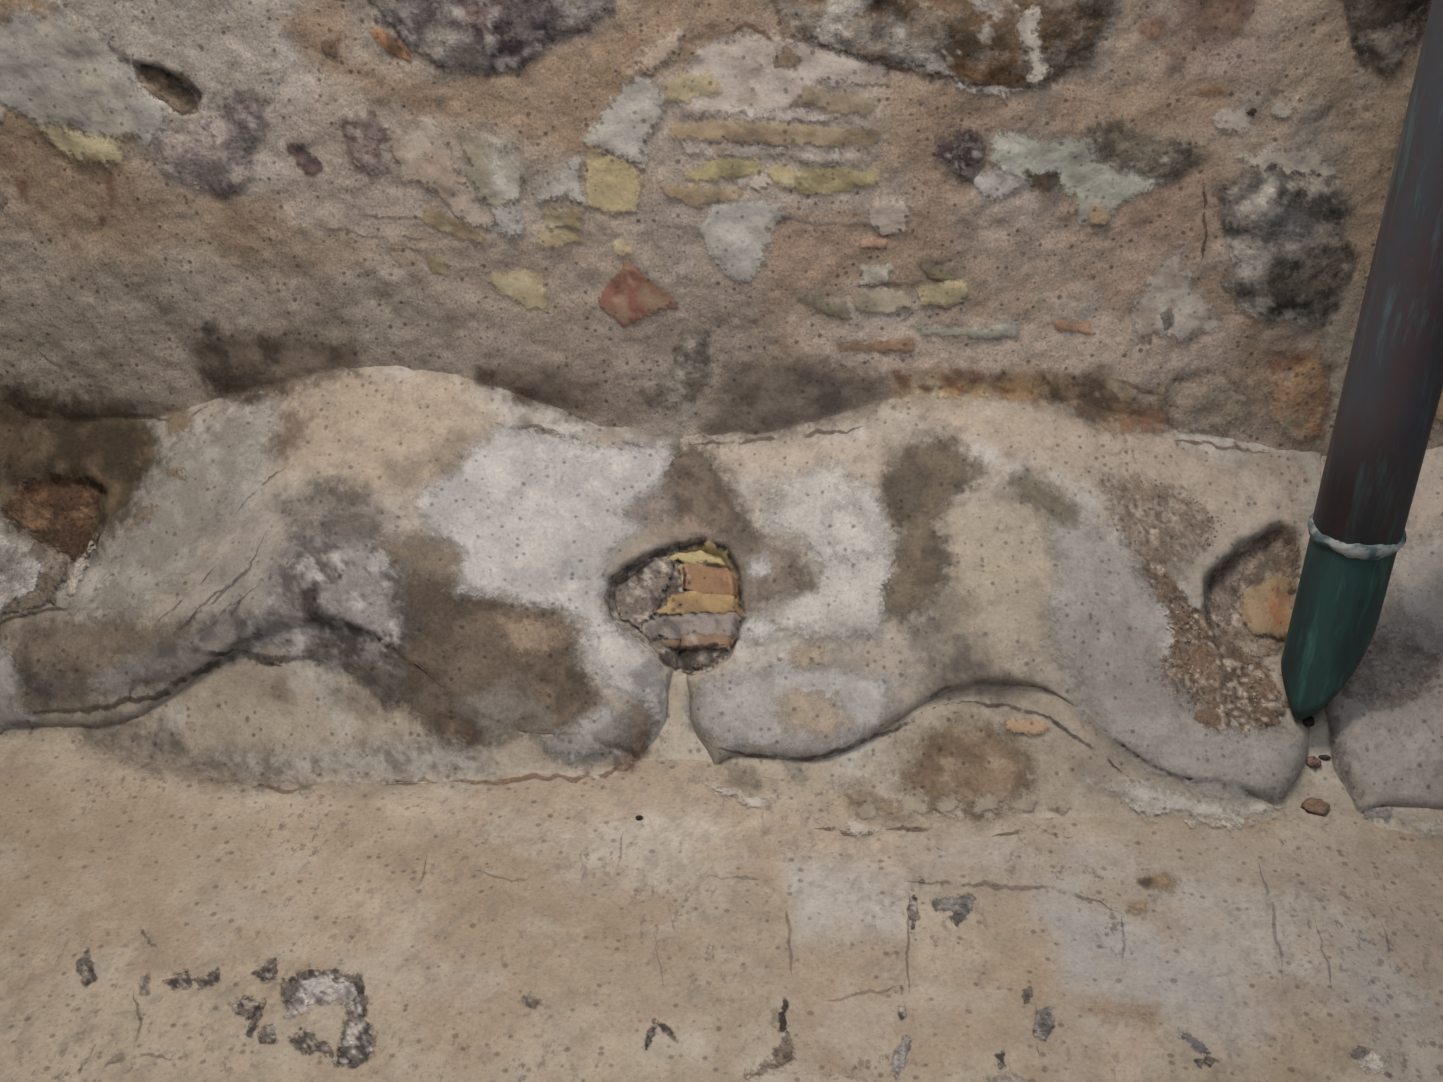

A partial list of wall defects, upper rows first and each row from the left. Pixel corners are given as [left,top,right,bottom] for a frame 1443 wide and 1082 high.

leakage [0,377,192,563]
leakage [265,413,305,455]
leakage [475,365,588,409]
crack [0,606,73,624]
crack [29,530,356,714]
leakage [4,475,663,791]
peeling [413,424,675,762]
peeling [1041,469,1443,836]
crack [706,685,1122,772]
peeling [690,772,770,808]
spalling [139,967,220,995]
spalling [229,957,378,1068]